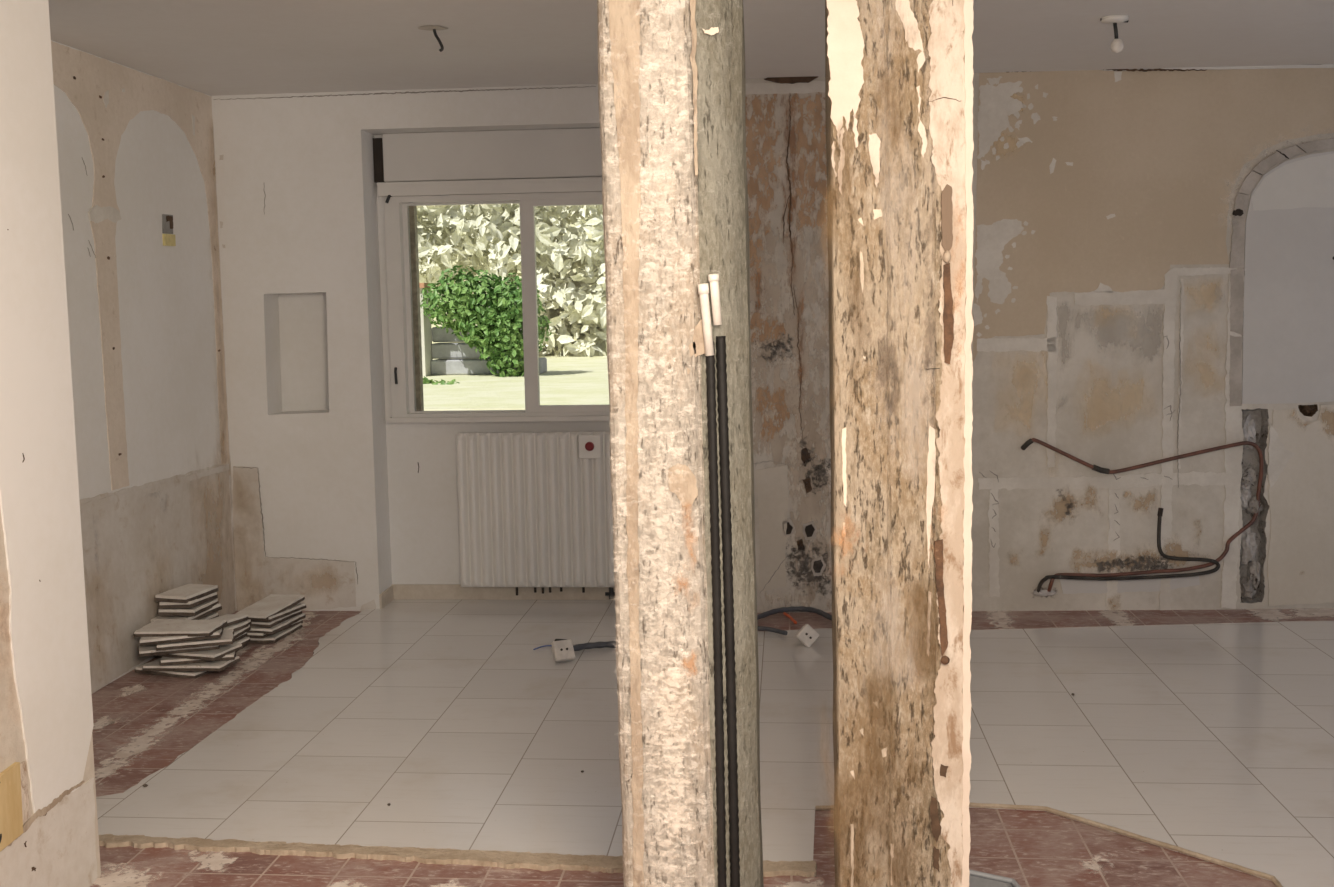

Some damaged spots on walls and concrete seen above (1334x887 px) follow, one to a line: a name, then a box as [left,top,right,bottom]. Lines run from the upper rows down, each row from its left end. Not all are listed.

peeling [976,76,1058,170]
peeling [972,219,1035,337]
water stain [799,437,831,494]
water stain [786,537,832,595]